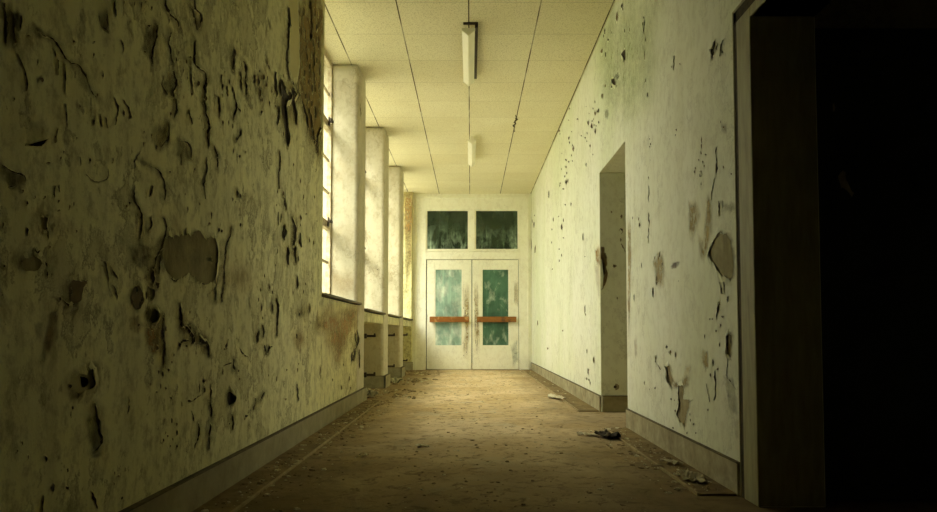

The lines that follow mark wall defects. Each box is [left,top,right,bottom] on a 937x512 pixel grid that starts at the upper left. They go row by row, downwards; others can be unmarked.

peeling [2,1,30,45]
peeling [254,0,323,155]
spalling [162,212,223,302]
peeling [277,213,317,294]
spalling [601,246,617,290]
peeling [652,252,663,296]
spalling [707,226,734,287]
peeling [131,276,211,401]
peeling [704,324,732,361]
spalling [227,385,237,411]
spalling [655,344,697,435]